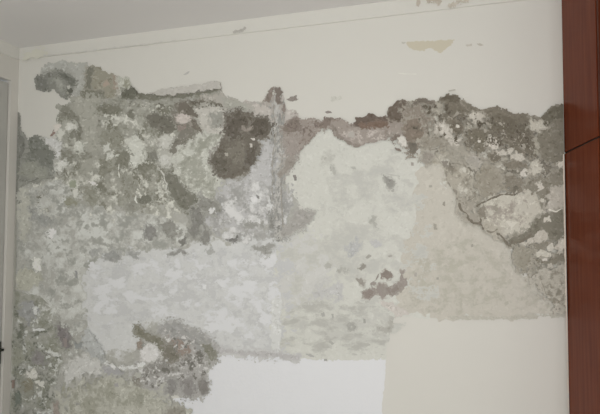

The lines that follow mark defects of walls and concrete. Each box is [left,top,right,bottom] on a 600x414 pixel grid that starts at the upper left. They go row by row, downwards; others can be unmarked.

peeling [402,39,455,53]
flaking render [12,64,319,414]
leakage [13,59,566,321]
leakage [305,233,417,338]
flaking render [381,172,400,192]
peeling [397,99,566,318]
crack [445,171,532,247]
leakage [11,300,314,414]